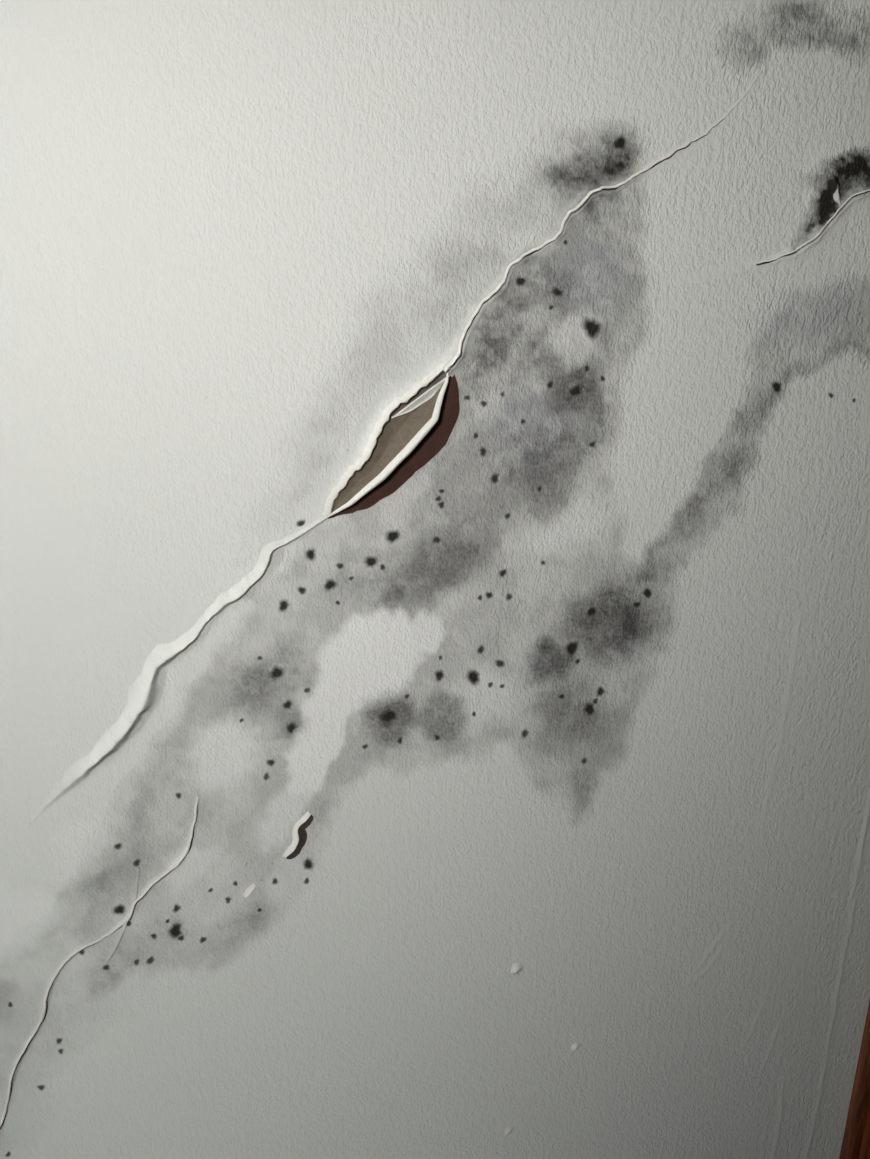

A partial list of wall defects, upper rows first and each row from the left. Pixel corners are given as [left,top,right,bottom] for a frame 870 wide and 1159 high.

crack [440,70,764,377]
crack [674,176,870,287]
crack [29,514,329,823]
peeling [307,351,460,519]
leakage [71,112,870,1012]
crack [0,796,199,1129]
leakage [0,928,202,1159]
leakage [0,727,207,1111]